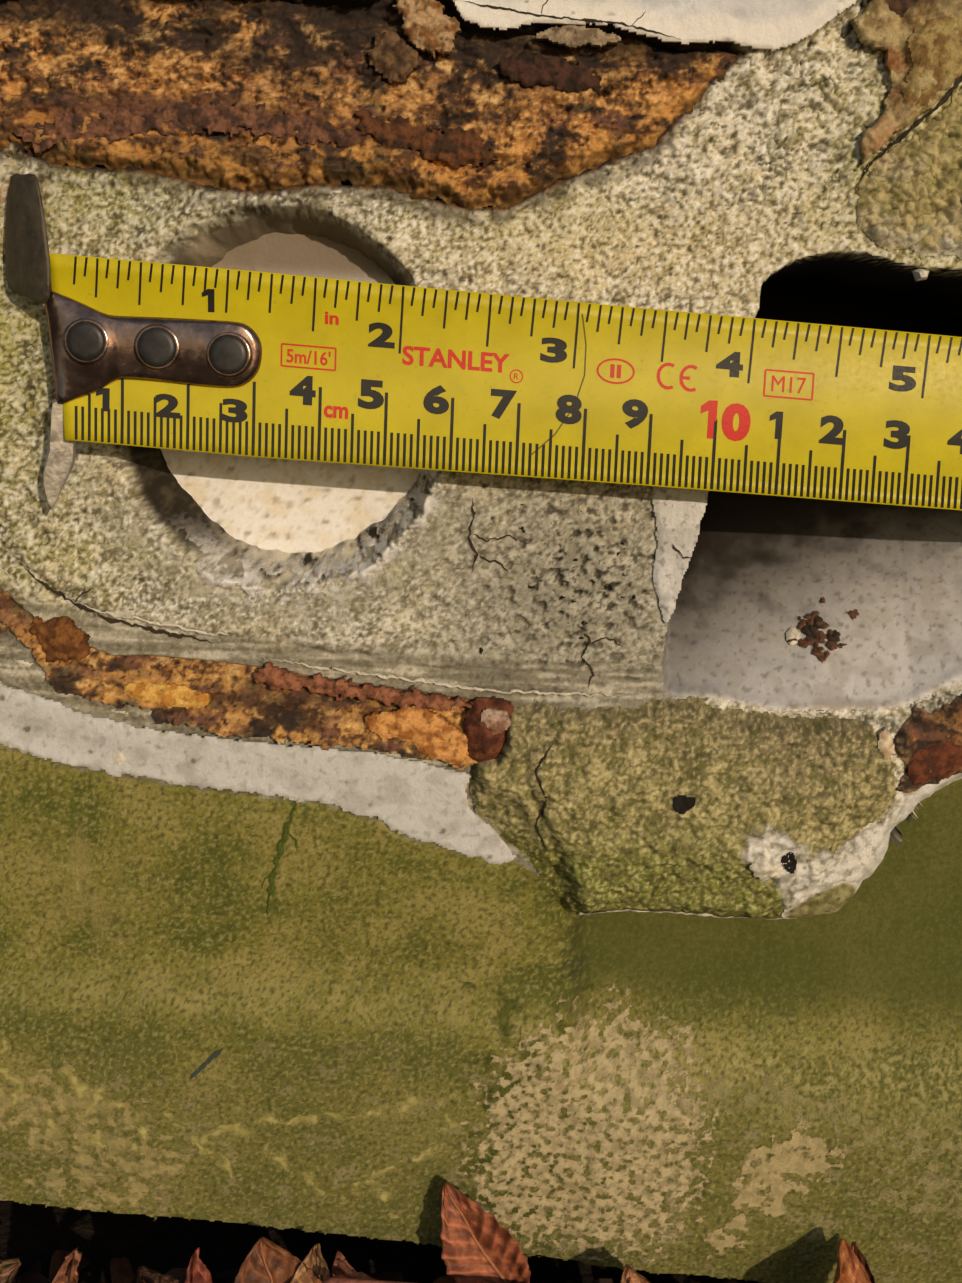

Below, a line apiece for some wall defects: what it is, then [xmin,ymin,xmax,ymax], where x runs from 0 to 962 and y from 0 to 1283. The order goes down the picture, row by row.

corrosion [0,0,739,210]
spalling [851,0,962,163]
spalling [912,269,929,281]
peeling [651,486,709,623]
peeling [81,604,238,637]
corrosion [0,588,514,770]
peeling [258,655,641,697]
corrosion [877,694,962,793]
crack [262,799,299,914]
spalling [673,795,696,814]
spalling [745,820,888,918]
water stain [0,985,962,1266]